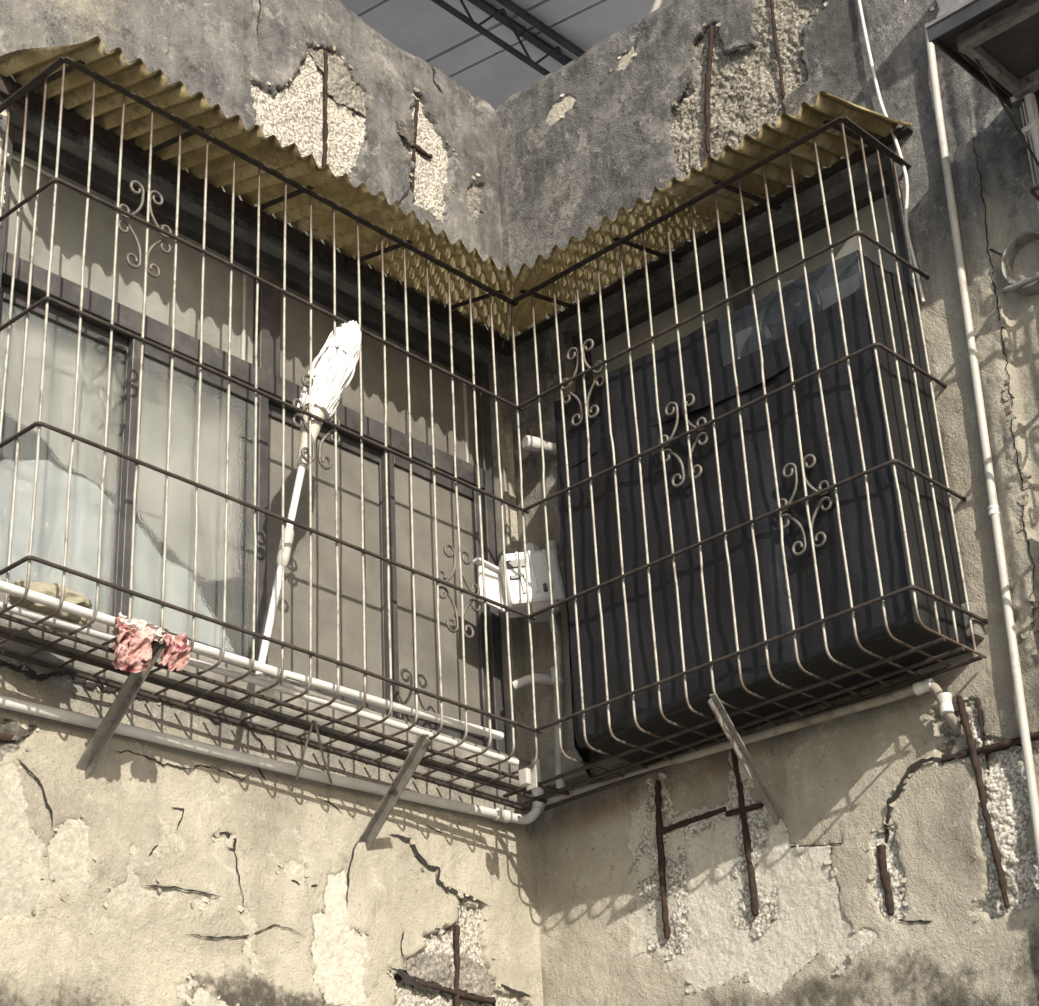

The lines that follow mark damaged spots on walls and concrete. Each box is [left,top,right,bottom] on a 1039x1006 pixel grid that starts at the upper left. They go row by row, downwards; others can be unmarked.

spalling [248,44,373,181]
spalling [396,87,457,223]
spalling [669,0,828,180]
crack [0,659,172,706]
crack [109,729,266,781]
spalling [925,695,1039,922]
crack [145,831,244,903]
crack [189,924,300,939]
crack [390,825,489,934]
spalling [386,897,530,1006]
peeling [627,748,878,995]
spalling [867,824,908,923]